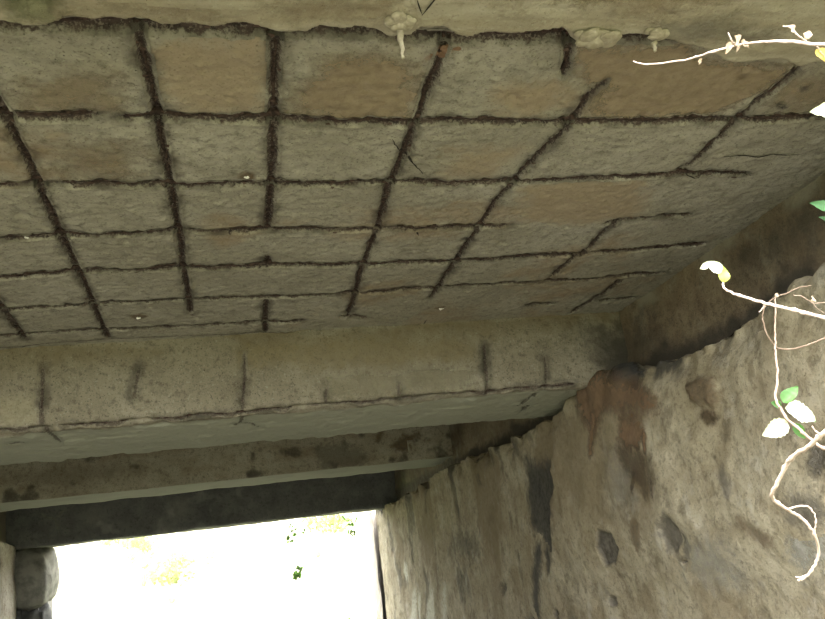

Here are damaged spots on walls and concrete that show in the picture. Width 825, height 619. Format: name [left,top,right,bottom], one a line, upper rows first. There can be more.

rust [149,37,267,127]
rust [281,41,420,119]
rust [473,43,788,119]
rust [0,138,25,182]
spalling [0,16,825,341]
rust [424,137,663,230]
rust [576,370,659,457]
leakage [520,442,561,619]
leakage [776,446,825,598]